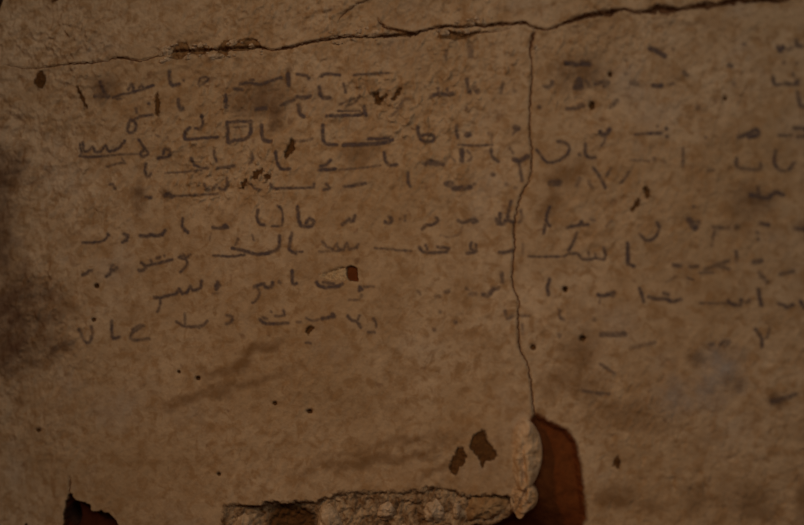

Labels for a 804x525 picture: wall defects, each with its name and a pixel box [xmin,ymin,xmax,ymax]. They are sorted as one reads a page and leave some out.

crack [9,0,788,416]
spalling [63,494,118,525]
spalling [221,413,586,525]